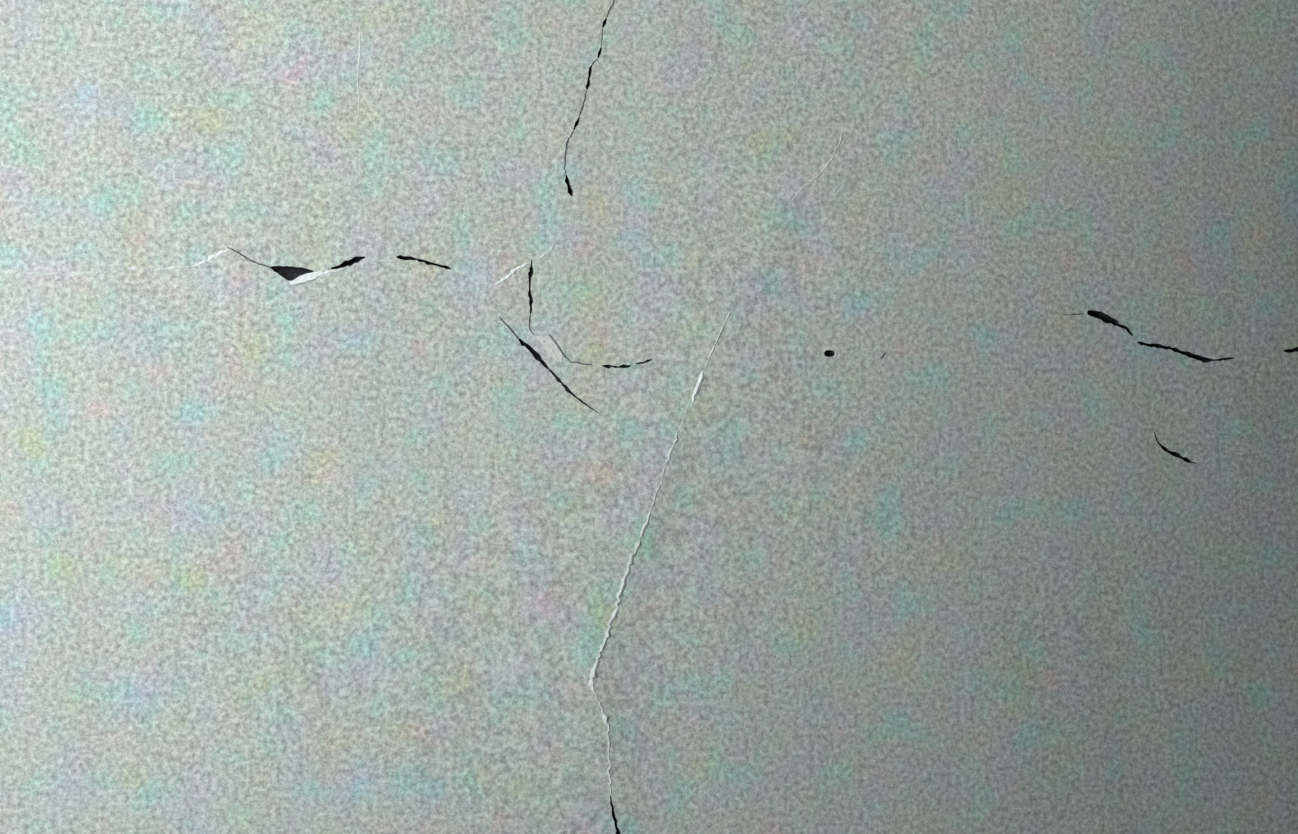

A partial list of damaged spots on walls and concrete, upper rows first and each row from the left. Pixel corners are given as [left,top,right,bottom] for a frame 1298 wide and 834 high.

crack [564,0,615,196]
crack [2,247,269,277]
crack [1064,310,1235,363]
crack [1284,346,1298,354]
crack [1154,432,1197,464]
crack [588,312,731,834]